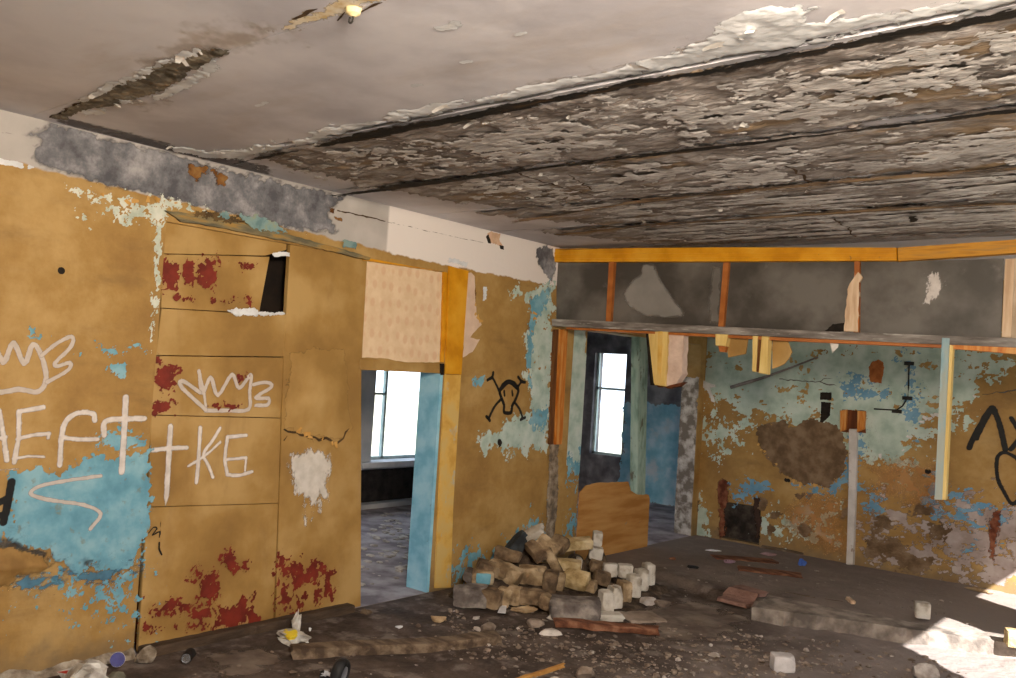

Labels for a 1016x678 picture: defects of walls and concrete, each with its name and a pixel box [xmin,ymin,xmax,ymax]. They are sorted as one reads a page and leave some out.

spalling [49,48,230,120]
peeling [166,0,1016,246]
spalling [825,323,845,332]
peeling [476,278,586,543]
peeling [617,402,631,486]
peeling [645,337,1016,576]
peeling [0,421,261,644]
peeling [271,551,337,615]
peeling [451,537,495,584]
rust [717,478,731,538]
peeling [207,648,282,676]